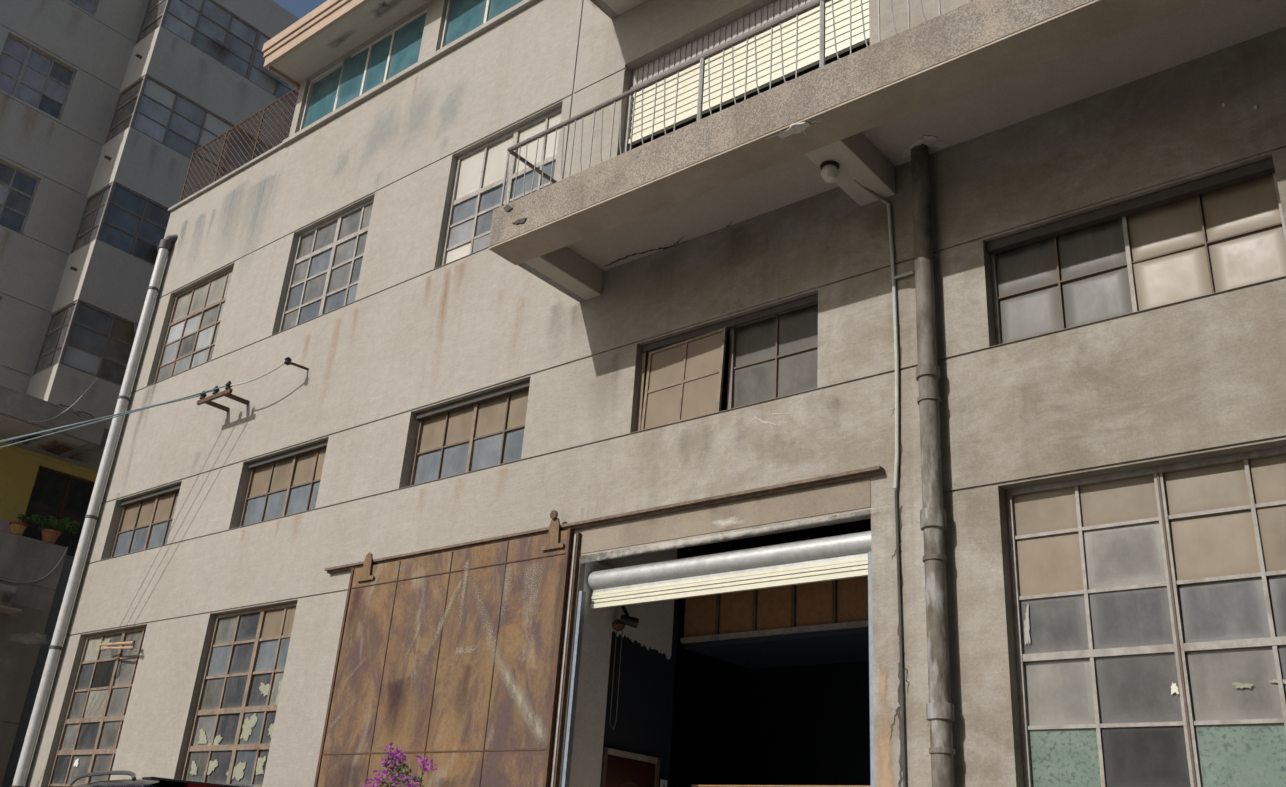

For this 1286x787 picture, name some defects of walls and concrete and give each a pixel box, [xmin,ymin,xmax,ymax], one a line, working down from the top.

crack [605,222,732,266]